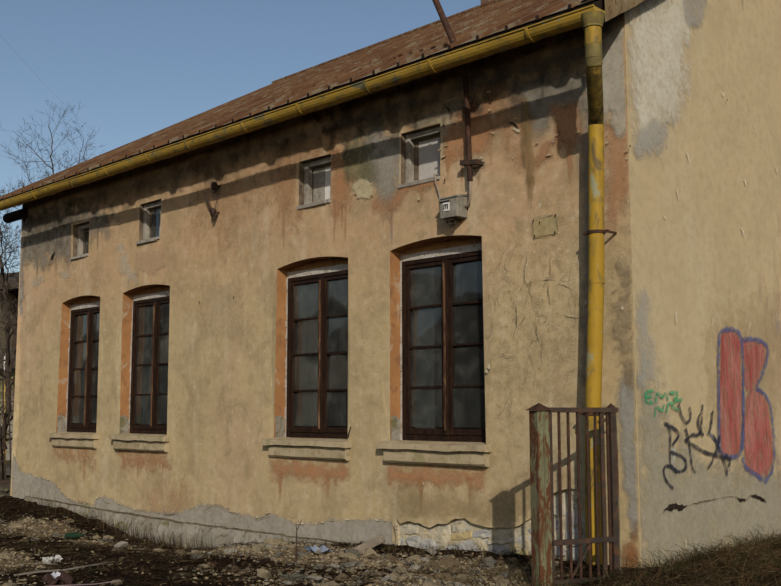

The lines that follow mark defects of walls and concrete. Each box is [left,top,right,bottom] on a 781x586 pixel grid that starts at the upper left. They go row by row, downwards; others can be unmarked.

peeling [352,179,374,199]
leakage [324,30,588,303]
peeling [535,102,582,173]
flaking render [602,0,691,221]
crack [485,214,586,417]
spalling [395,518,531,555]
spalling [554,489,586,562]